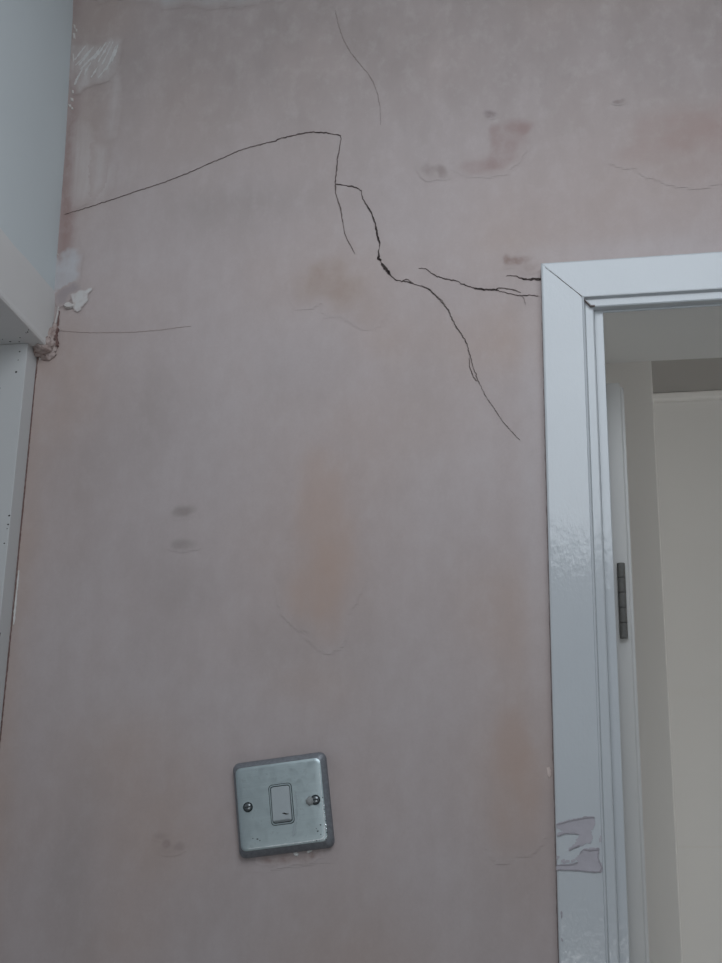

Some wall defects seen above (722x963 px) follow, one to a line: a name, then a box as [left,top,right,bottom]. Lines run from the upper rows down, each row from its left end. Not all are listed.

crack [60,131,559,963]